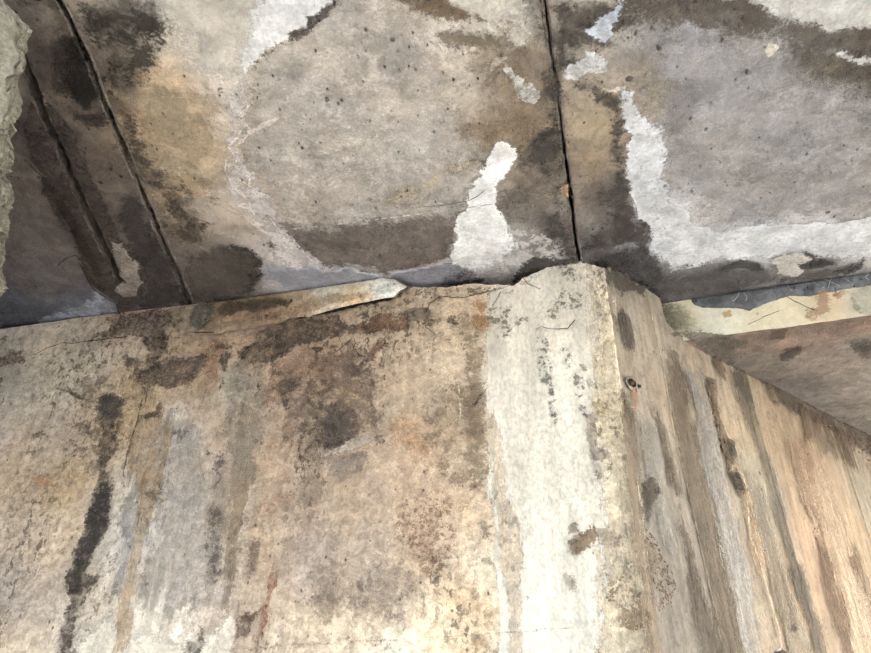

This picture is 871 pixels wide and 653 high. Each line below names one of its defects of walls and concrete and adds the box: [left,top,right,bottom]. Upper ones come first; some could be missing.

water stain [121,91,225,248]
spalling [23,0,410,335]
water stain [189,530,223,610]
water stain [216,342,231,389]
water stain [238,307,441,507]
water stain [306,564,414,625]
water stain [605,266,646,297]
water stain [616,308,635,351]
water stain [667,345,764,653]
water stain [736,445,828,653]
water stain [767,383,871,474]
water stain [810,462,871,653]